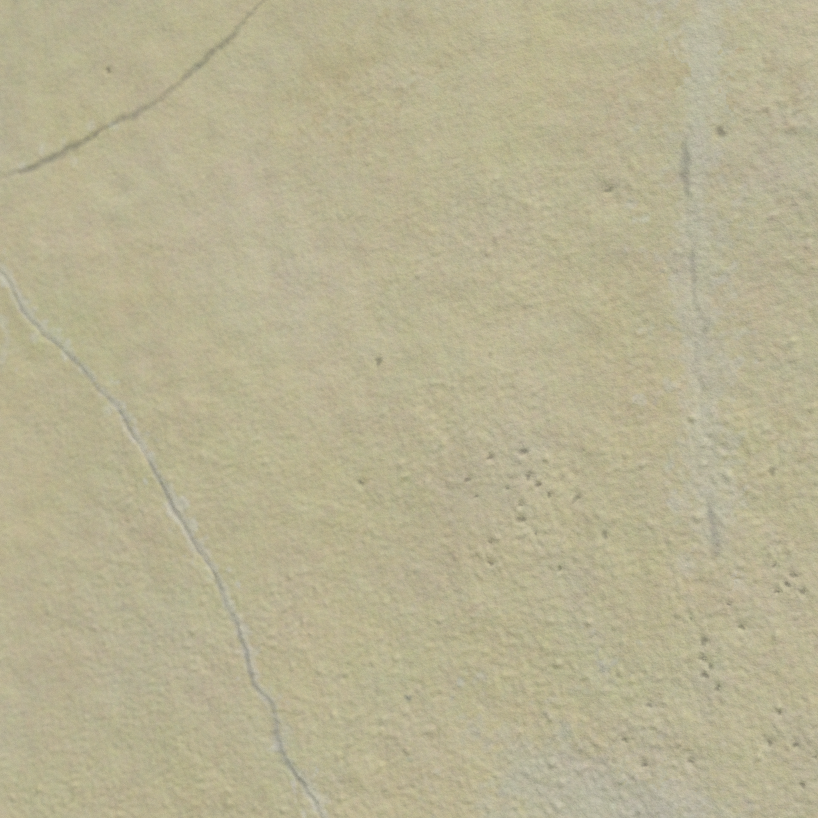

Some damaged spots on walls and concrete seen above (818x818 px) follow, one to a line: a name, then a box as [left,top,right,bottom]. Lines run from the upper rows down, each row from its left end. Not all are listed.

crack [18,118,120,171]
crack [0,247,335,818]